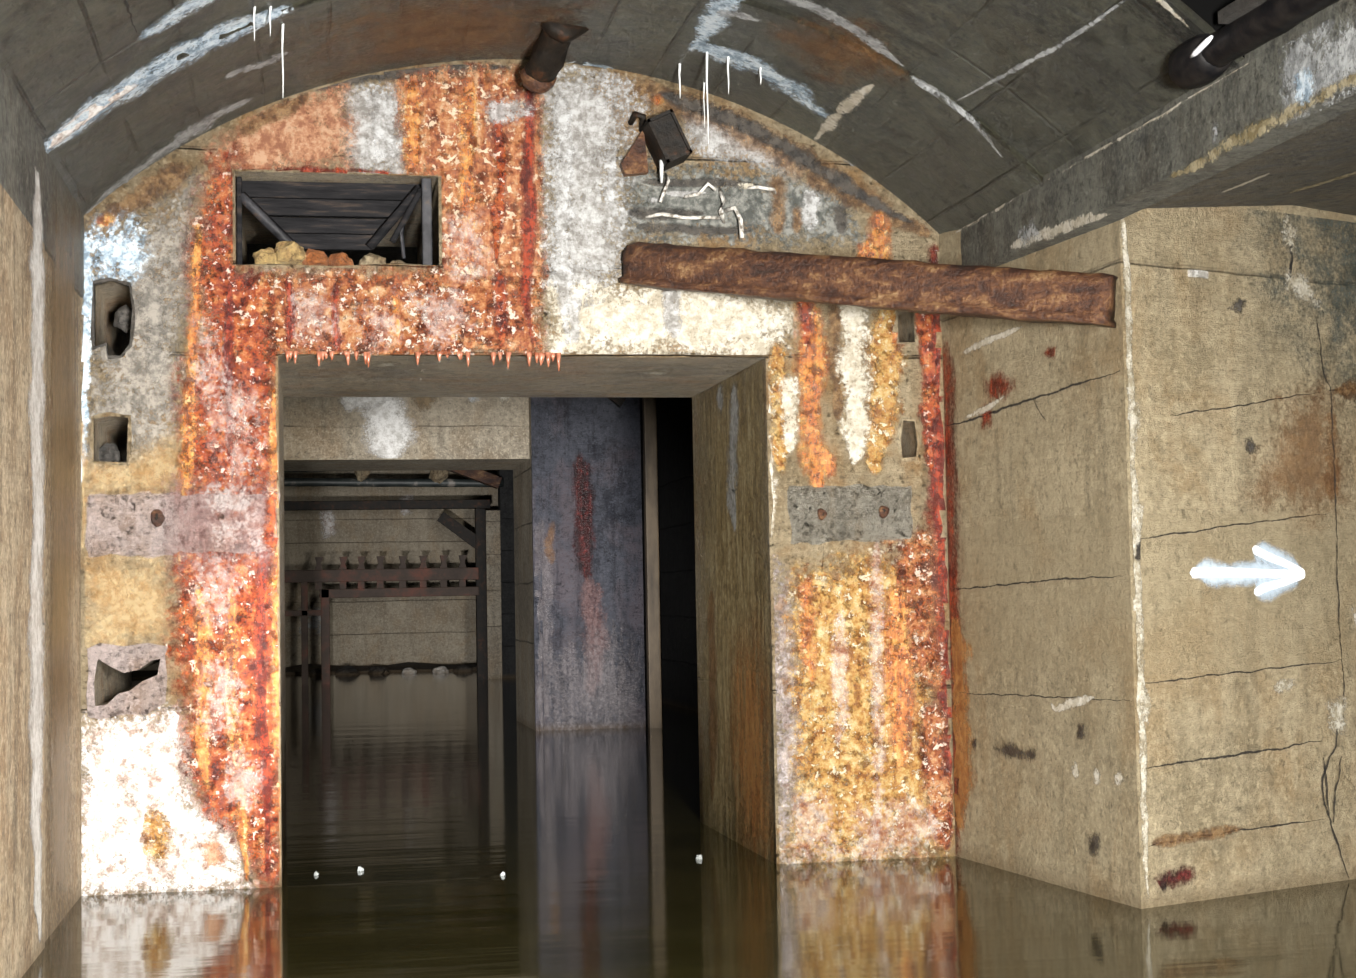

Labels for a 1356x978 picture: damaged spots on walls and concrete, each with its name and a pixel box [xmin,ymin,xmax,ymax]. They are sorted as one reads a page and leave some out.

water stain [44,6,293,153]
water stain [139,0,214,39]
water stain [689,0,874,140]
spalling [90,277,135,359]
spalling [88,412,133,467]
water stain [28,63,510,941]
corrosion [96,62,561,888]
corrosion [571,454,595,581]
corrosion [695,302,973,864]
crack [918,215,1356,877]
spalling [86,643,168,719]
corrosion [1154,866,1195,891]